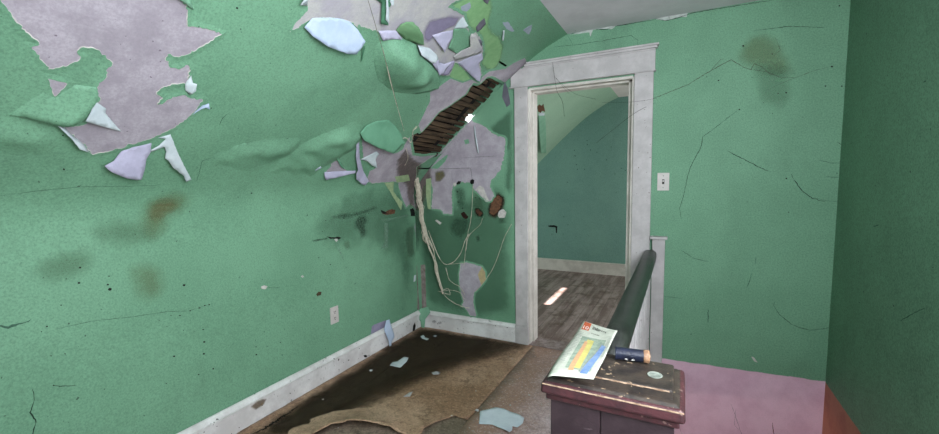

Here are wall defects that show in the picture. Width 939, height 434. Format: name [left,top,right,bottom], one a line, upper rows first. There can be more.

flaking render [1,0,220,154]
flaking render [292,0,532,224]
crack [679,109,740,216]
crack [653,26,843,99]
crack [728,151,835,202]
flaking render [457,260,488,318]
crack [29,385,76,434]
water stain [271,322,522,434]